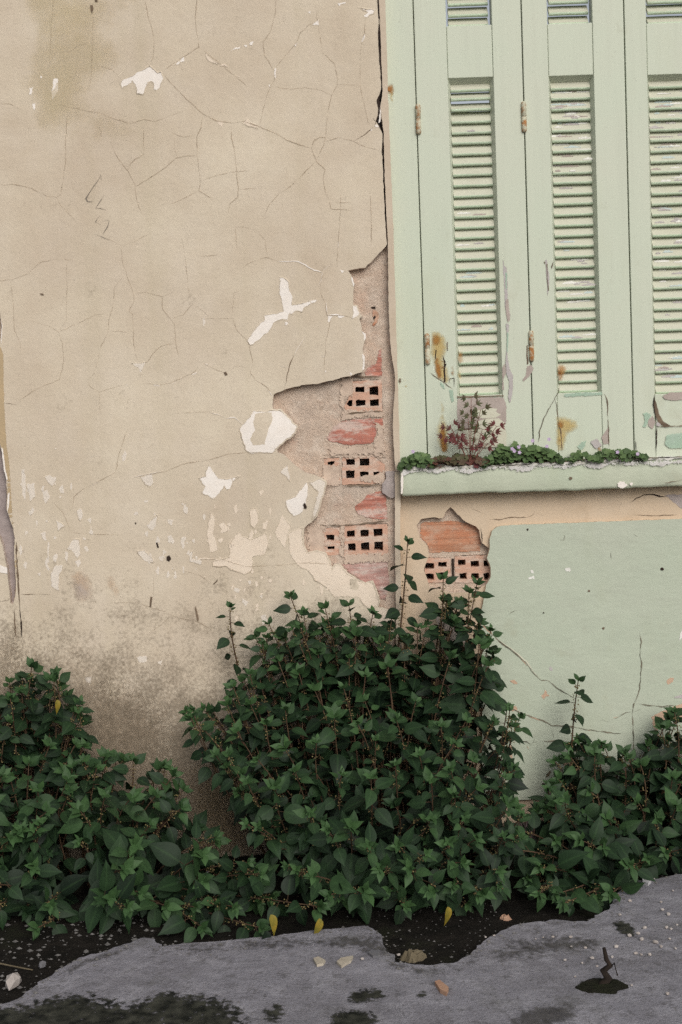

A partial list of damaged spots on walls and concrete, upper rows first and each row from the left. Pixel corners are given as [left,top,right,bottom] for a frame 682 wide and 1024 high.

peeling [120,55,185,96]
crack [356,0,383,149]
peeling [246,276,318,346]
peeling [328,305,360,322]
corrosion [433,334,447,380]
peeling [238,409,298,455]
corrosion [558,419,575,447]
flaking render [0,447,93,602]
peeling [134,464,394,643]
crack [484,625,574,698]
crack [513,637,674,749]